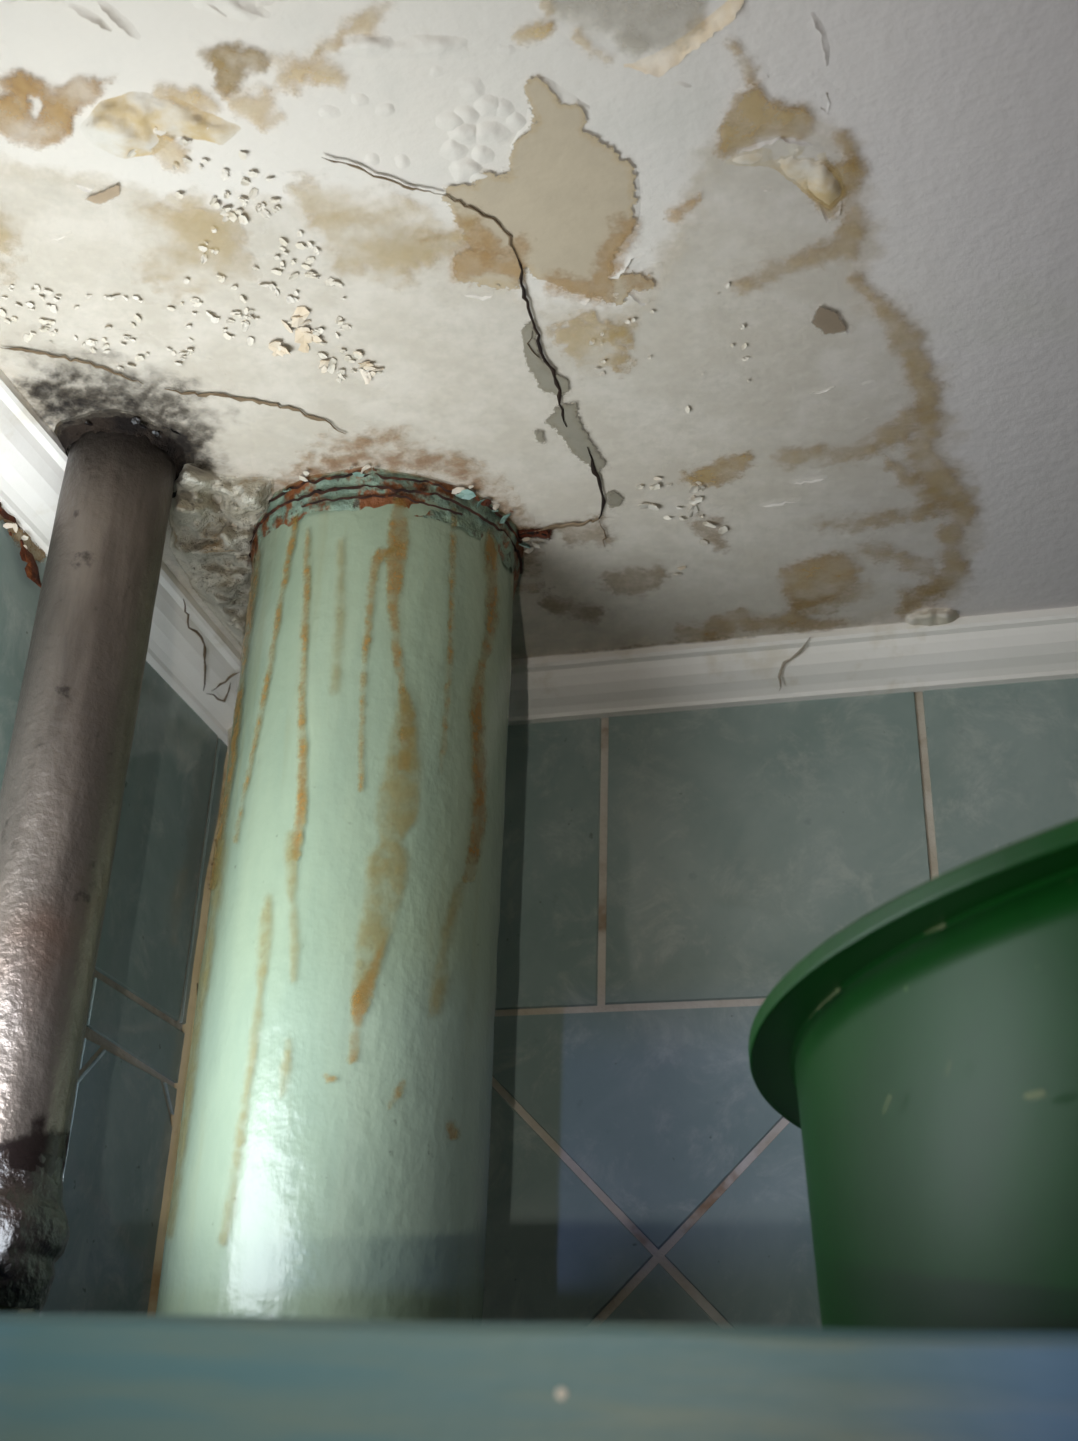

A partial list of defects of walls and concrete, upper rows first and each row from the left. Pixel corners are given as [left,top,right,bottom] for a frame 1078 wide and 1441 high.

damp [0,71,101,145]
peeling [1,0,142,40]
damp [190,44,265,103]
peeling [624,0,744,88]
damp [719,79,809,156]
spalling [442,76,654,324]
crack [0,347,346,434]
crack [249,157,607,574]
spalling [169,463,310,650]
corrosion [516,528,552,563]
corrosion [281,515,310,860]
corrosion [359,497,415,886]